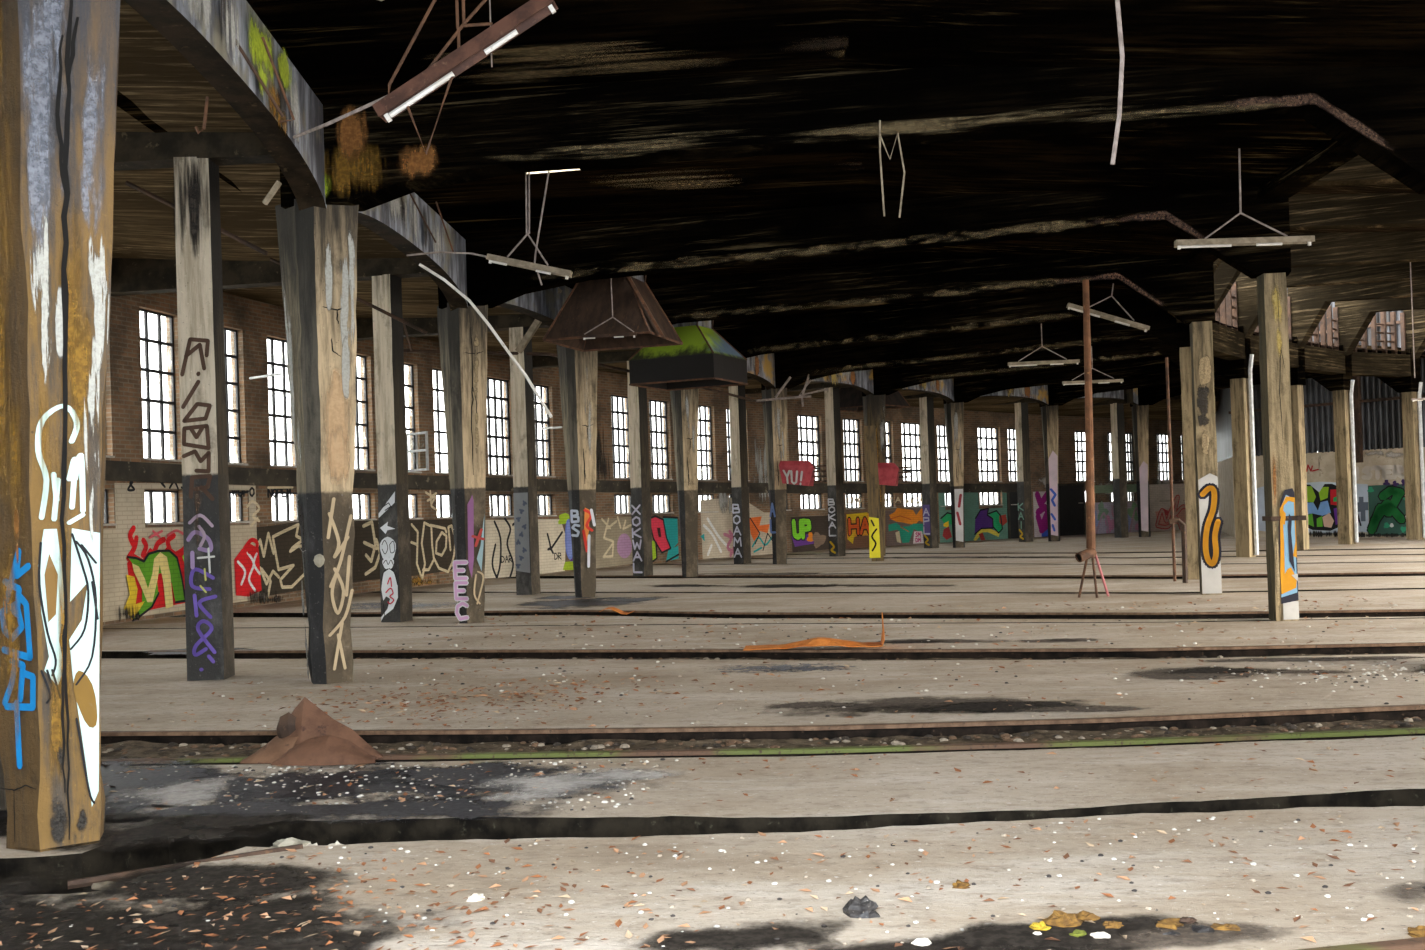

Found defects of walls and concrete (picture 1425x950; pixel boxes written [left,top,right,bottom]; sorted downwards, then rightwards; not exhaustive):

water stain [24,0,64,247]
water stain [81,72,103,224]
corrosion [324,107,379,195]
corrosion [402,145,435,178]
water stain [0,311,20,506]
crack [1,0,79,841]
water stain [67,244,91,428]
water stain [0,557,19,712]
water stain [51,557,69,771]